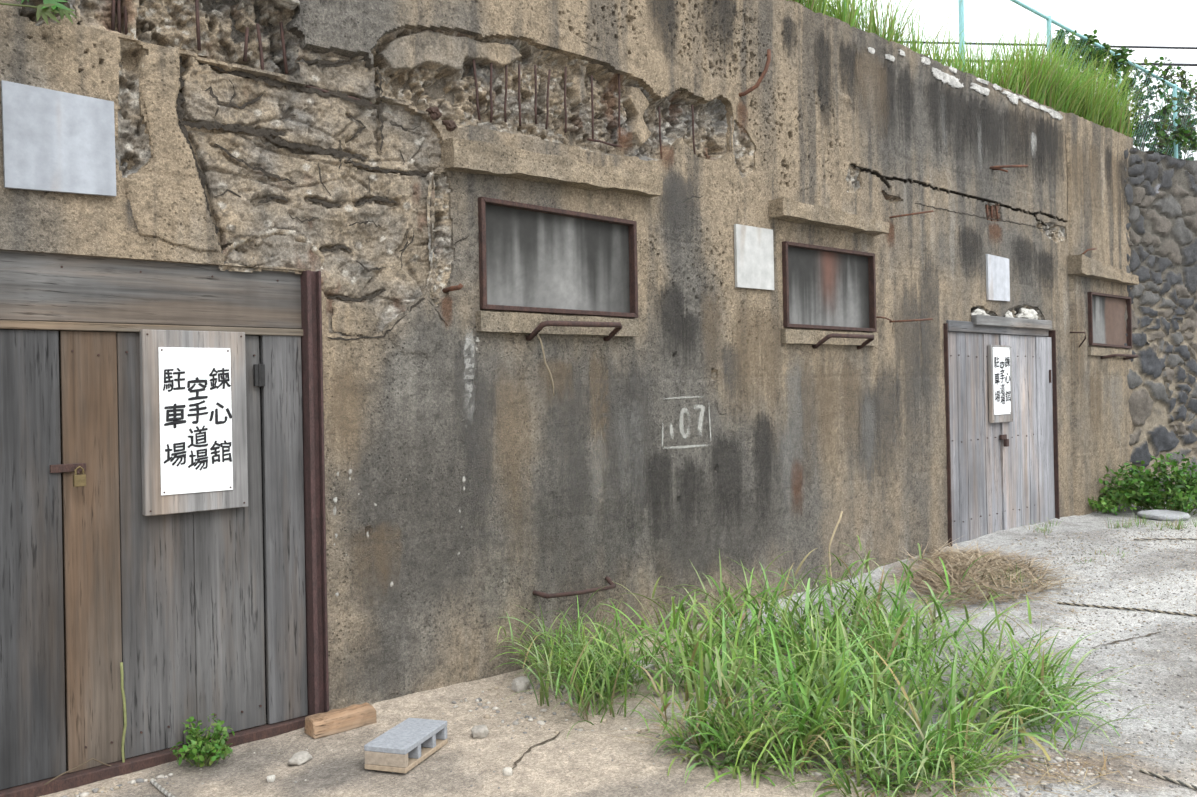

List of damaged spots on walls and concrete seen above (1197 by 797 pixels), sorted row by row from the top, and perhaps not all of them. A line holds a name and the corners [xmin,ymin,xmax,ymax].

crack [176,56,220,245]
spalling [17,0,860,390]
water stain [784,18,797,52]
peeling [868,47,905,62]
water stain [815,35,1075,174]
crack [852,131,1069,233]
peeling [921,57,1063,120]
water stain [1090,149,1129,208]
spalling [971,305,1044,320]
water stain [1016,239,1053,285]
water stain [455,338,505,490]
water stain [549,367,741,525]